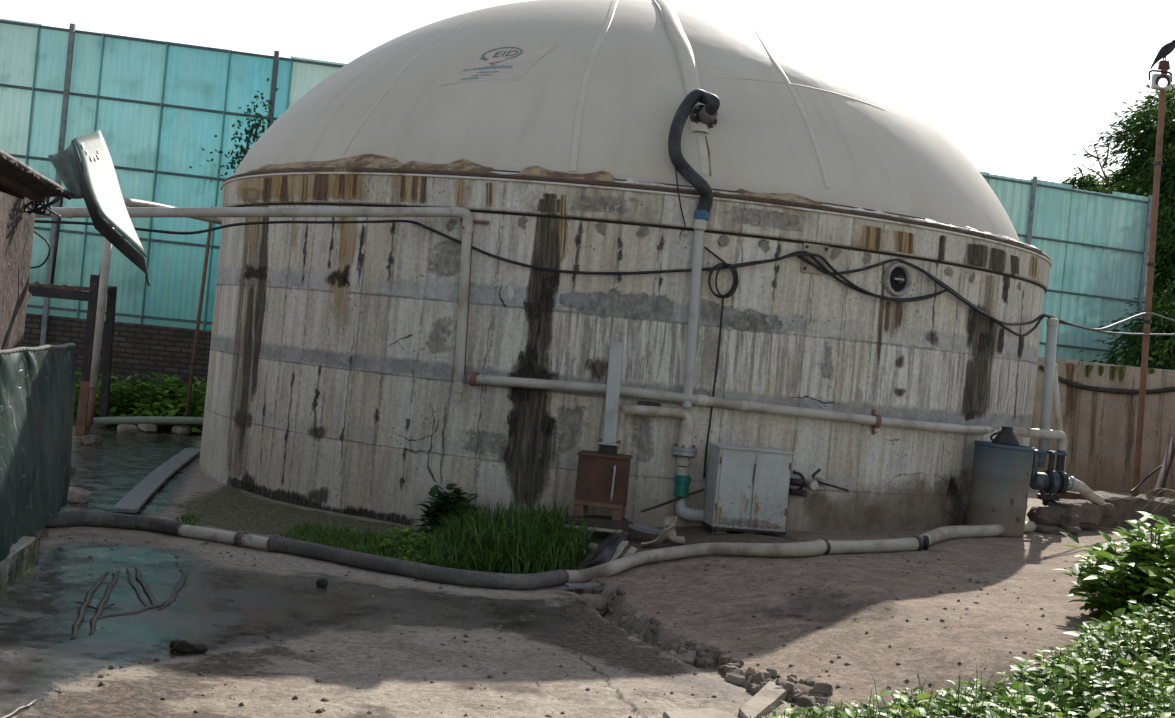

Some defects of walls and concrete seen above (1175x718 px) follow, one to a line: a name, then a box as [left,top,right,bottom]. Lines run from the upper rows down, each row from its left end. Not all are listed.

water stain [227,188,269,493]
corrosion [237,168,365,325]
crack [260,341,354,485]
crack [370,334,446,493]
water stain [499,193,561,508]
corrosion [860,226,913,259]
corrosion [878,264,906,361]
water stain [962,244,1020,420]
water stain [308,488,328,504]
water stain [344,505,367,516]